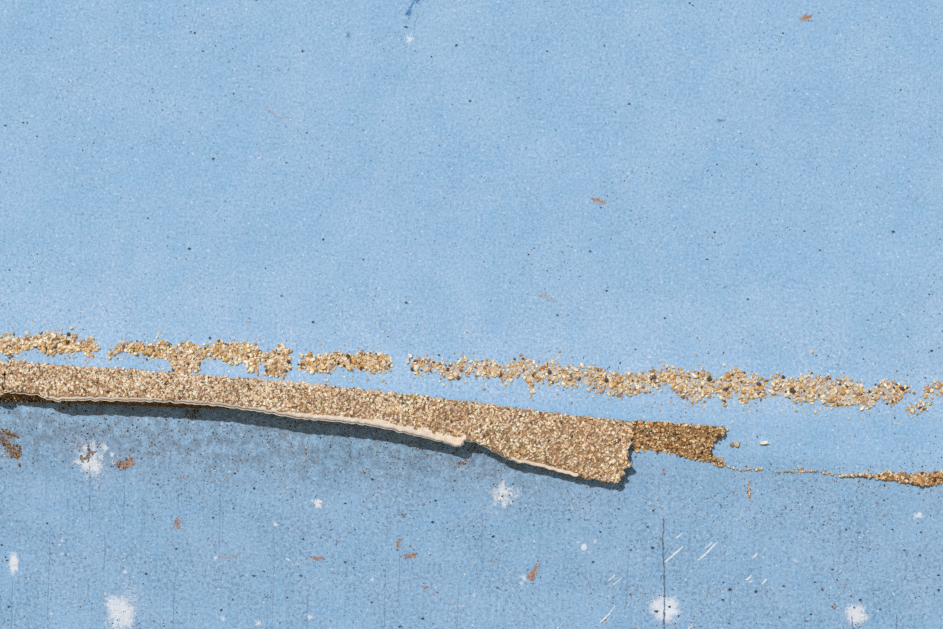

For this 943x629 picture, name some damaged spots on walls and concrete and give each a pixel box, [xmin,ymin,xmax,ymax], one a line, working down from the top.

damp [98,568,147,629]
damp [642,583,691,628]
damp [839,595,875,629]